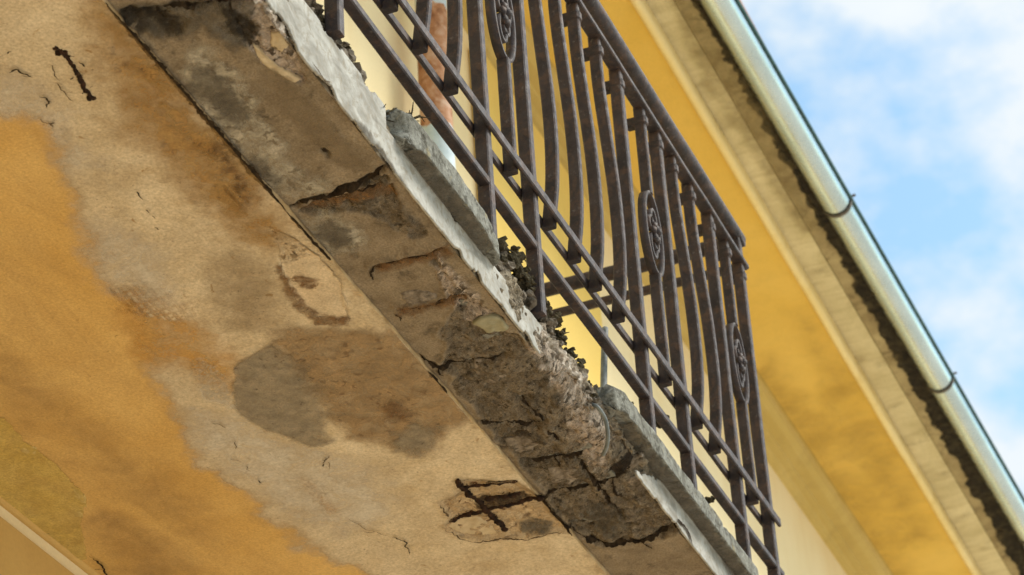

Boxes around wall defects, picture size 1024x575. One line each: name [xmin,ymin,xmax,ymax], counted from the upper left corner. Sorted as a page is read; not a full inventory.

water stain [120,0,329,197]
crack [106,0,383,260]
peeling [0,0,672,575]
crack [369,247,442,280]
water stain [233,328,468,456]
crack [481,395,693,549]